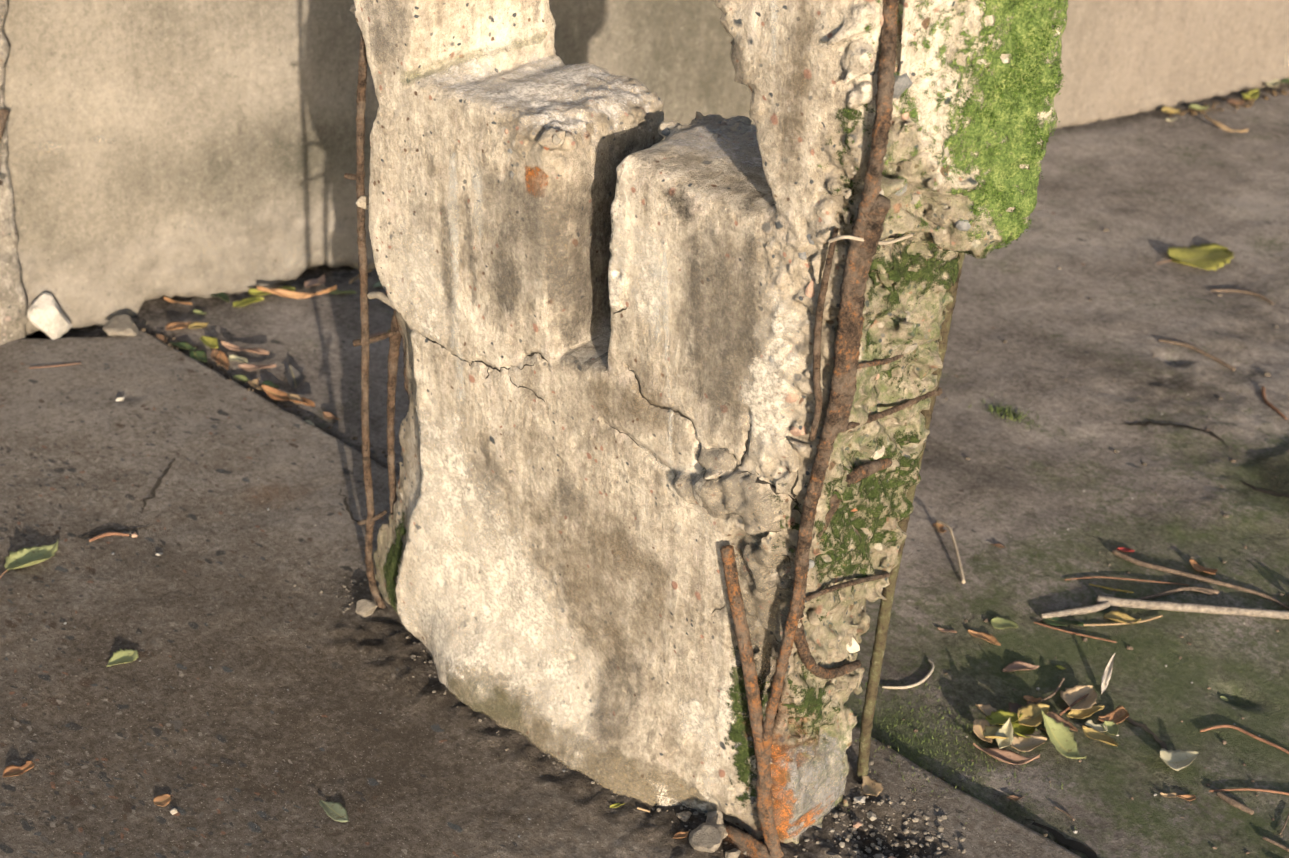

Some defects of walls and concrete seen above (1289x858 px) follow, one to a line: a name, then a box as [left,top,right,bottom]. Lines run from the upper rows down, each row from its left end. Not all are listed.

crack [415,332,548,409]
rust [525,167,547,196]
leakage [450,137,668,372]
leakage [664,190,692,219]
crack [603,367,801,539]
leakage [685,231,799,446]
spalling [672,0,965,858]
leakage [398,409,707,807]
rust [762,742,834,840]